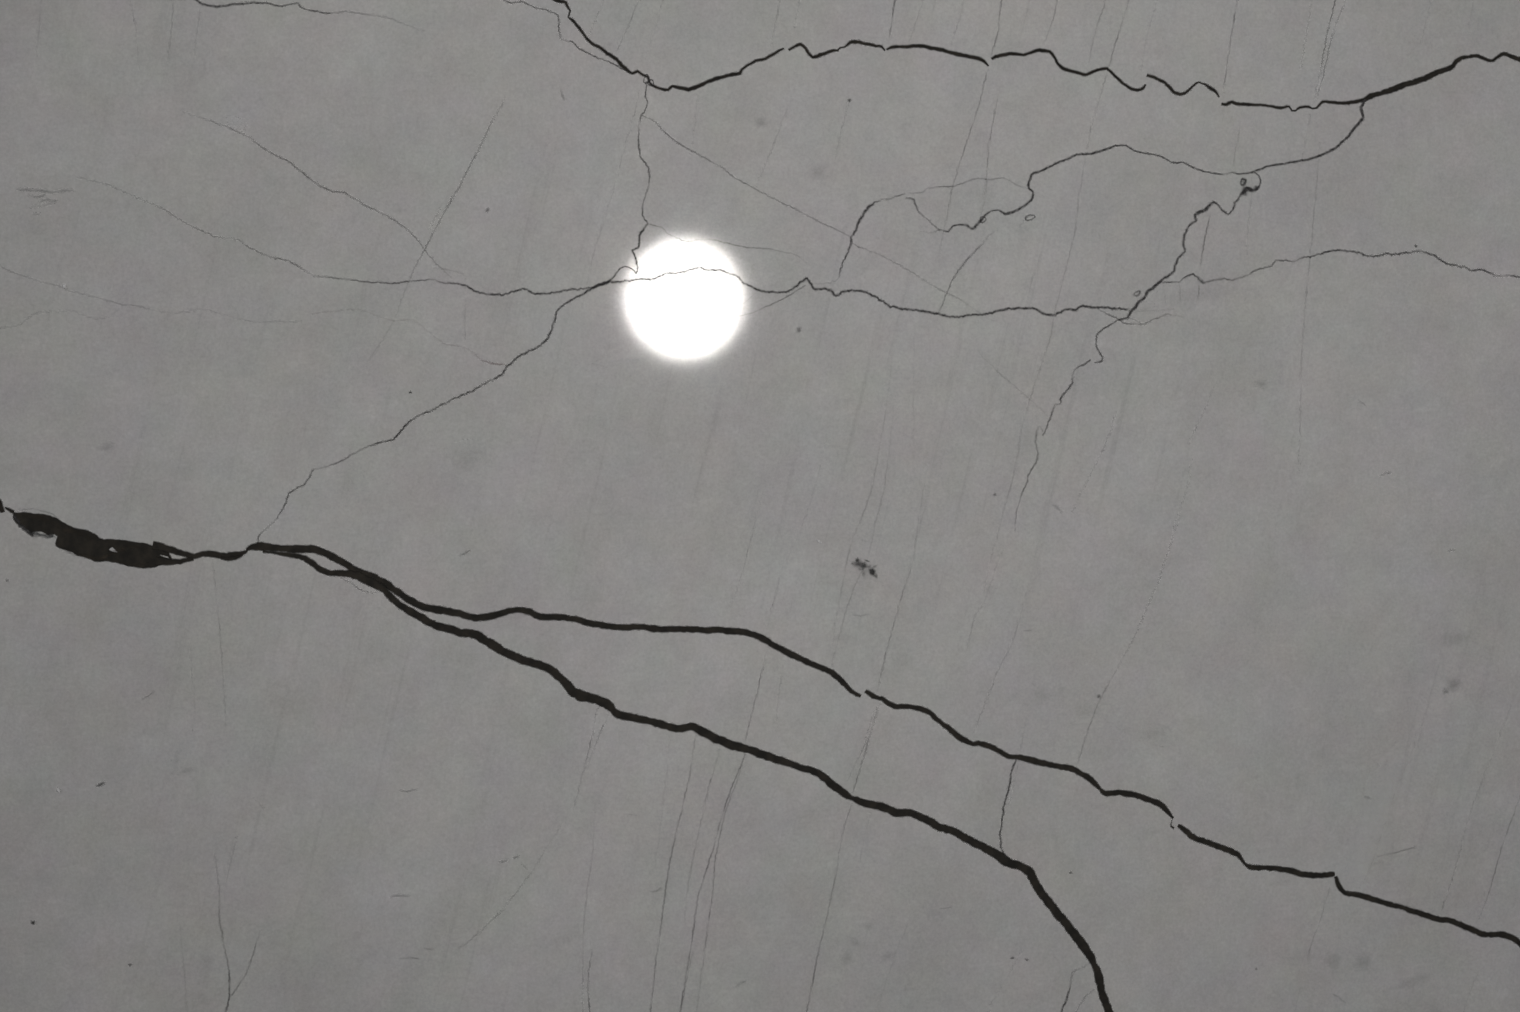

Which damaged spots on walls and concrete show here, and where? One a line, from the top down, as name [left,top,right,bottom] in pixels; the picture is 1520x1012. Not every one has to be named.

crack [196,0,329,14]
crack [357,0,1520,444]
crack [0,481,1520,1012]